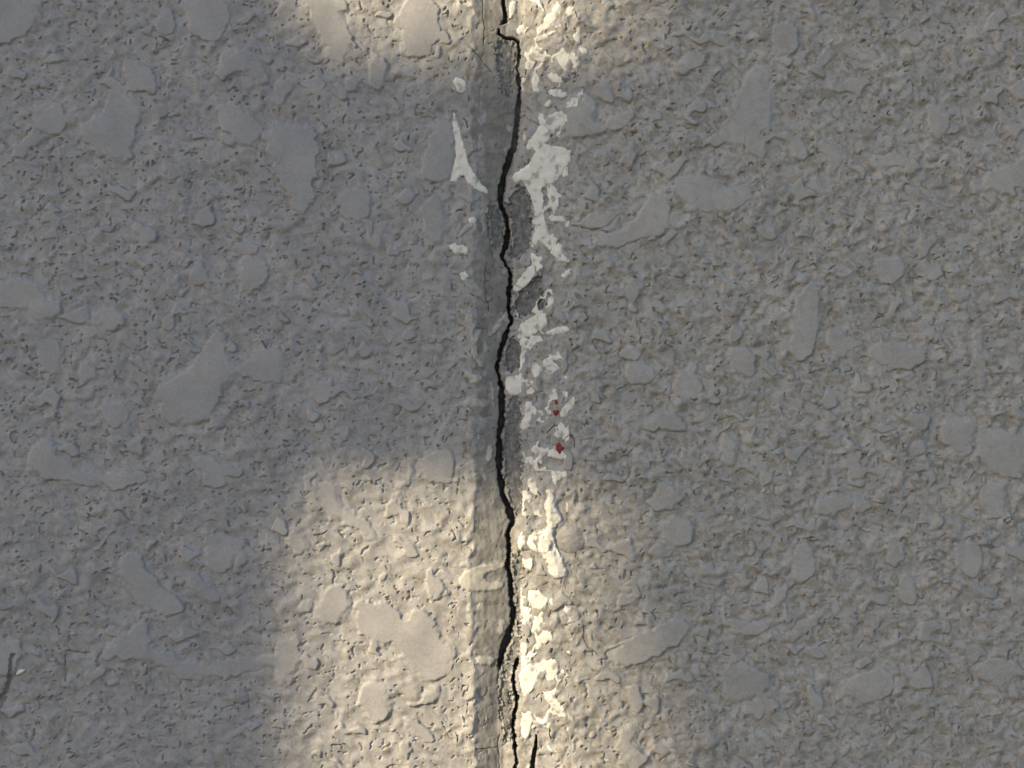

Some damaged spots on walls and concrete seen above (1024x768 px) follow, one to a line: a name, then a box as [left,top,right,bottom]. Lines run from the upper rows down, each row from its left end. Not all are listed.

crack [469,0,538,768]
peeling [449,0,588,743]